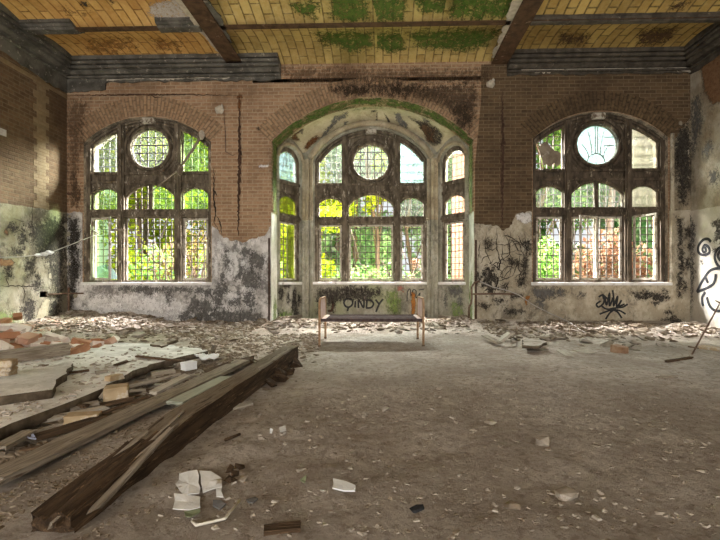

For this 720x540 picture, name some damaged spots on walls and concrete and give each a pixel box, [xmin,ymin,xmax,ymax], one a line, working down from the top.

peeling [291,111,348,149]
flaking render [395,112,443,146]
crack [213,169,222,233]
leakage [213,238,257,301]
leakage [84,285,216,321]